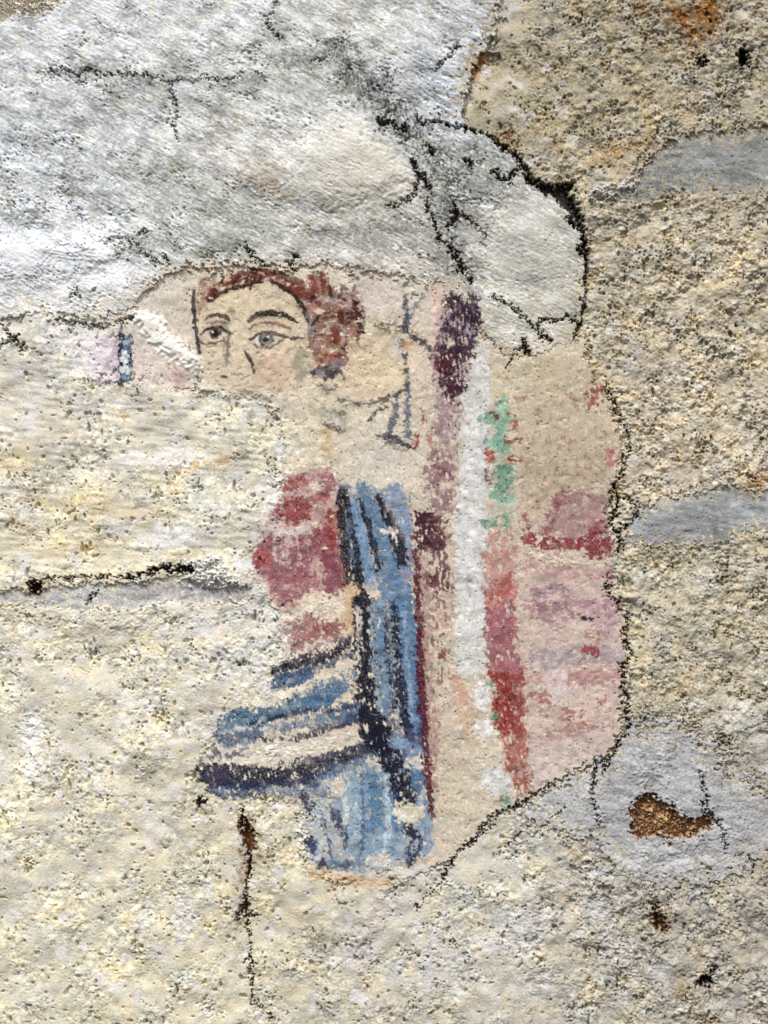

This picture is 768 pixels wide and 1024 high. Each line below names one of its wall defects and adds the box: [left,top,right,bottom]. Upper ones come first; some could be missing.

crack [262,0,284,41]
crack [432,39,461,73]
hole [689,50,711,70]
hole [735,47,754,71]
crack [48,64,268,144]
crack [97,225,172,271]
crack [243,240,303,275]
crack [372,109,593,370]
crack [52,282,136,332]
crack [41,559,195,606]
crack [413,382,645,915]
rust [224,800,287,936]